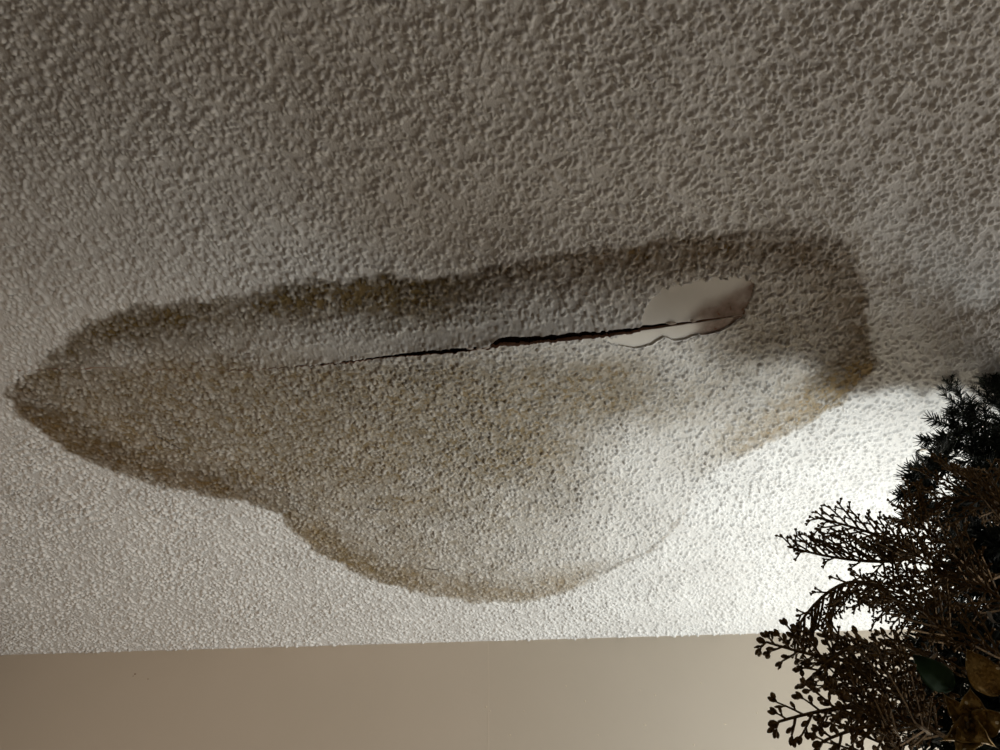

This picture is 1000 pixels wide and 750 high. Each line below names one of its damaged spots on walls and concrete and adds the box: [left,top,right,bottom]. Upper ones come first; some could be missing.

leakage [572,235,837,277]
crack [18,316,733,372]
peeling [606,276,755,349]
leakage [14,275,657,591]
leakage [739,360,873,446]